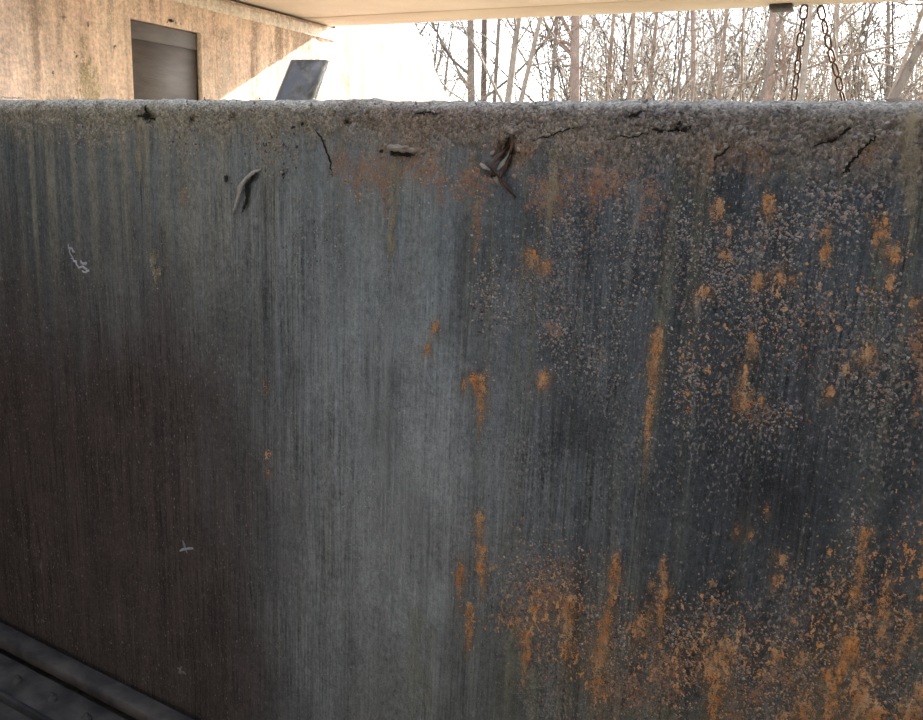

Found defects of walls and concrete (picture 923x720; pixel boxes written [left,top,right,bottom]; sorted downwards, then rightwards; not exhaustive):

crack [315,130,334,175]
corrosion [327,130,502,264]
corrosion [517,138,678,242]
corrosion [711,188,736,242]
corrosion [757,191,782,221]
crack [814,119,882,174]
corrosion [459,361,495,428]
corrosion [633,204,913,467]
corrosion [894,296,923,428]
corrosion [451,500,923,720]